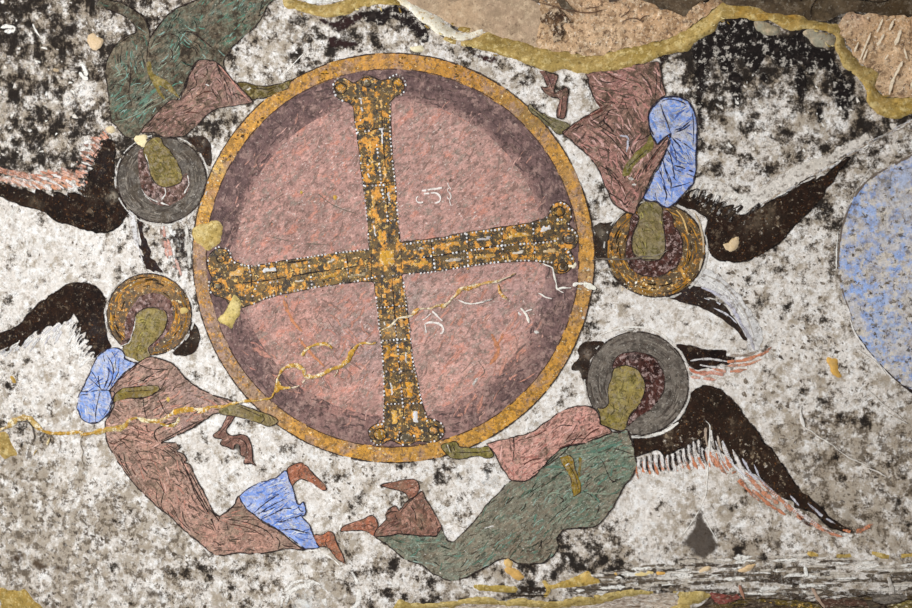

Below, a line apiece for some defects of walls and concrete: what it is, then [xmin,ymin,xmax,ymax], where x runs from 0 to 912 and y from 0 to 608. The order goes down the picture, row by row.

flaking render [407,0,722,56]
water stain [692,18,855,133]
flaking render [838,12,912,98]
crack [0,263,596,467]
flaking render [562,592,679,608]